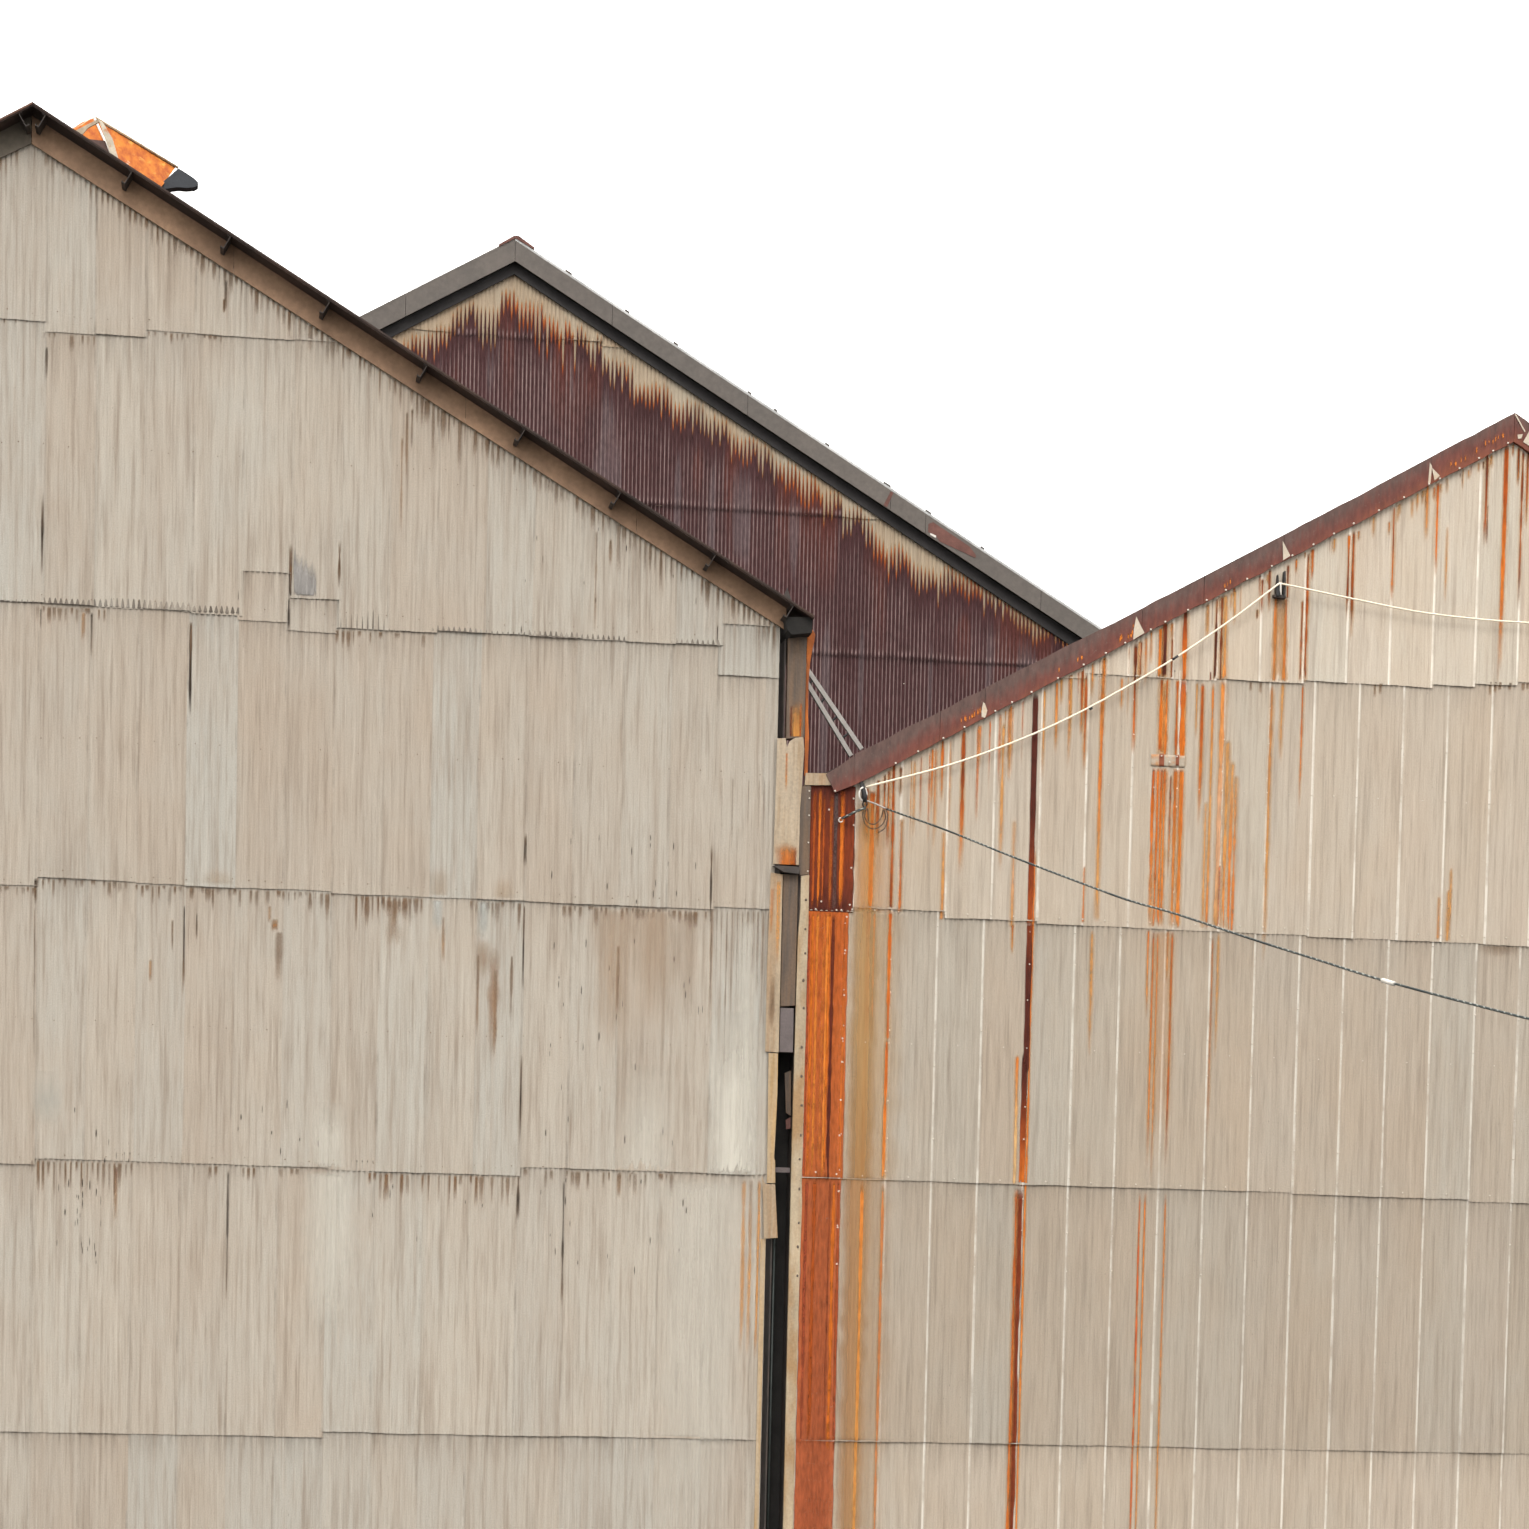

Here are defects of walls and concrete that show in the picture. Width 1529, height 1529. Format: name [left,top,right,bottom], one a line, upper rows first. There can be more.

corrosion [1334,434,1529,641]
corrosion [403,290,1237,1529]
corrosion [1256,549,1314,909]
corrosion [1437,872,1452,941]